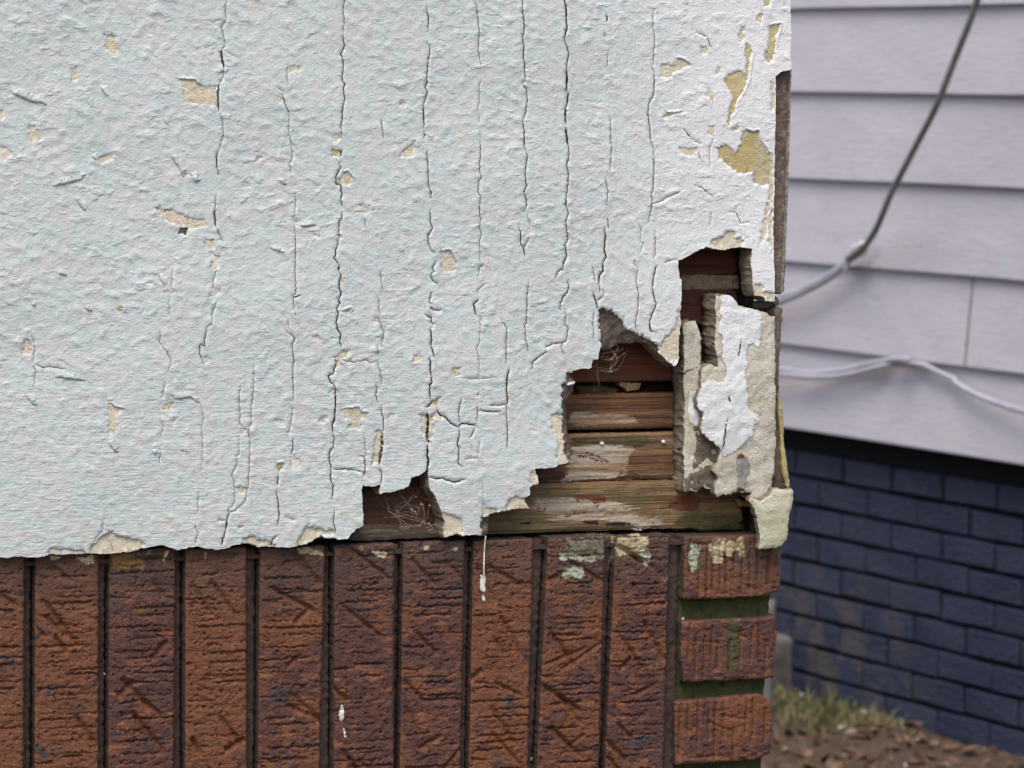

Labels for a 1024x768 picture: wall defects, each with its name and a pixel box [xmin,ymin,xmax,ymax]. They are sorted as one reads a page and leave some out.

spalling [1,532,215,559]
crack [216,4,227,174]
crack [195,370,255,545]
crack [278,73,297,453]
crack [328,1,384,532]
spalling [418,468,529,538]
crack [422,0,612,497]
spalling [550,368,587,464]
spalling [598,308,681,367]
crack [634,13,749,333]
peeling [699,0,784,302]
peeling [745,486,794,550]